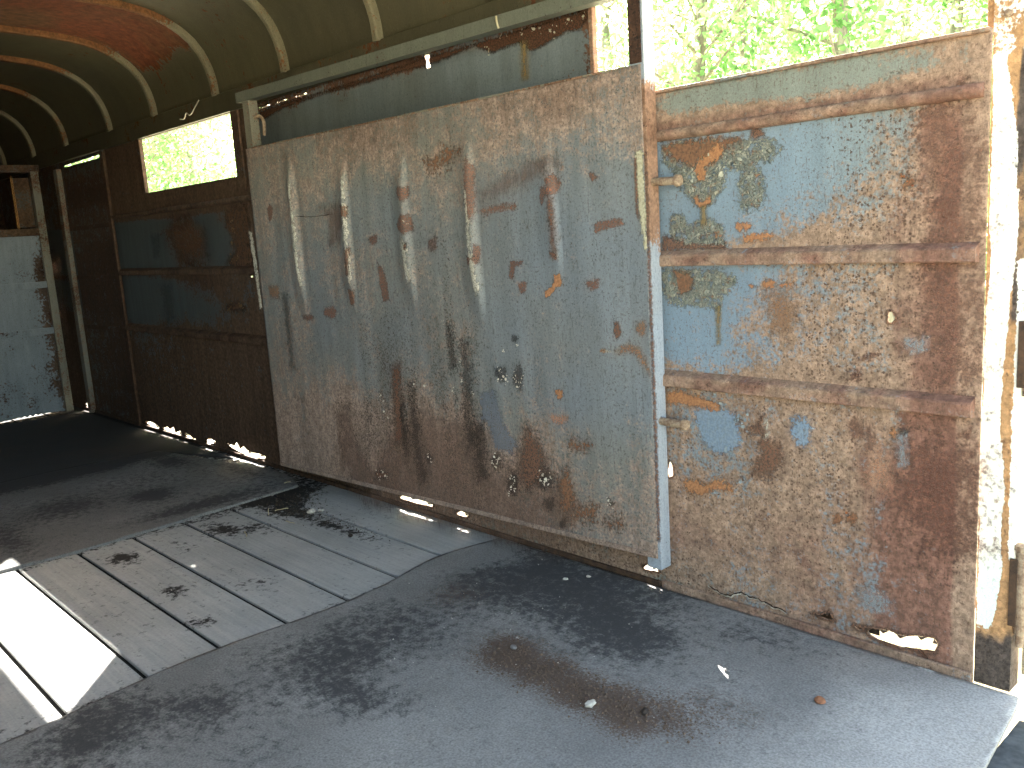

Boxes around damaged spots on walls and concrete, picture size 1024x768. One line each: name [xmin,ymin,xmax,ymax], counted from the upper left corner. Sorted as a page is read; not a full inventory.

rust [260,11,588,119]
rust [594,218,624,234]
peeling [661,136,783,246]
rust [735,222,774,244]
rust [894,99,1003,250]
peeling [661,267,737,344]
rust [908,262,1004,396]
rust [379,363,428,483]
rust [441,320,490,483]
rust [518,428,627,534]
rust [884,412,1015,574]
crack [708,585,787,613]